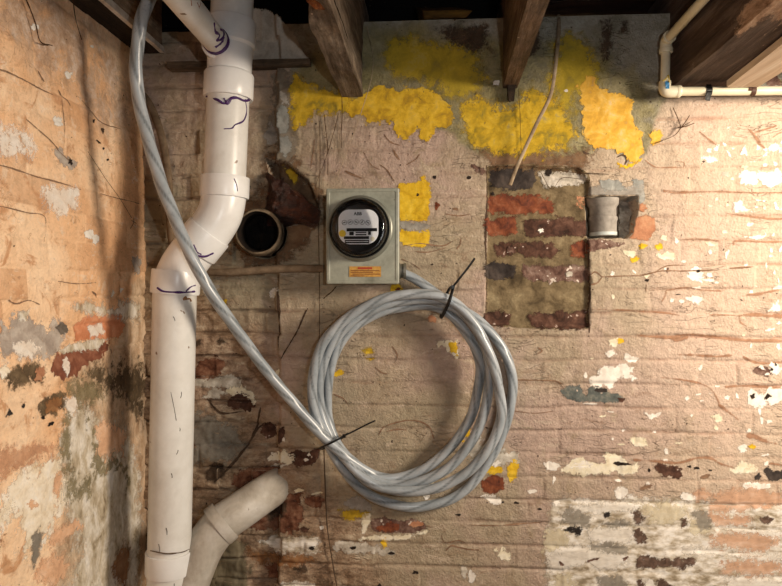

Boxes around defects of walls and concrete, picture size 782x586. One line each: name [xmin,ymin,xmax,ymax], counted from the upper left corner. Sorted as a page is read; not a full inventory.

spalling [288,30,719,332]
peeling [699,141,782,188]
damp [72,298,141,323]
spalling [195,338,256,412]
peeling [560,337,640,417]
peeling [724,387,782,424]
damp [59,355,146,586]
spalling [205,422,320,489]
damp [31,526,43,568]
spalling [250,488,325,537]
spalling [332,496,428,556]
peeling [541,429,782,586]